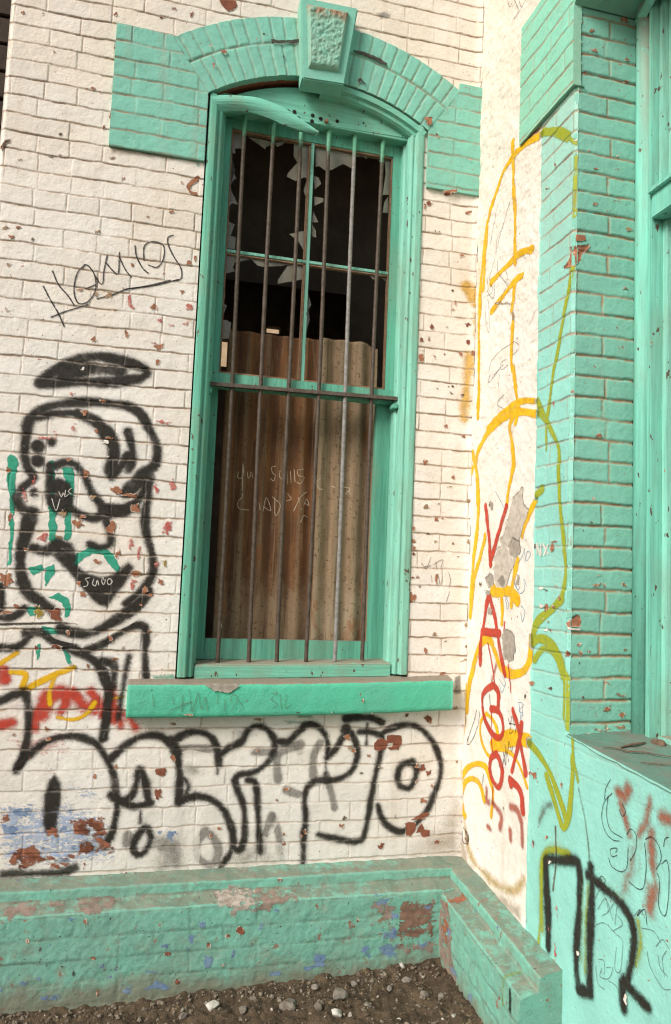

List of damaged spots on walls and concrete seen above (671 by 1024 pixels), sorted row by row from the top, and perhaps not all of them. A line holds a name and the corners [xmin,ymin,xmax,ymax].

peeling [220,0,237,11]
peeling [181,175,200,195]
spalling [564,234,590,269]
spalling [479,487,529,615]
spalling [501,629,515,664]
spalling [565,615,590,664]
spalling [343,734,402,757]
spalling [394,763,441,844]
peeling [0,804,114,870]
peeling [212,867,298,938]
spalling [356,893,468,981]